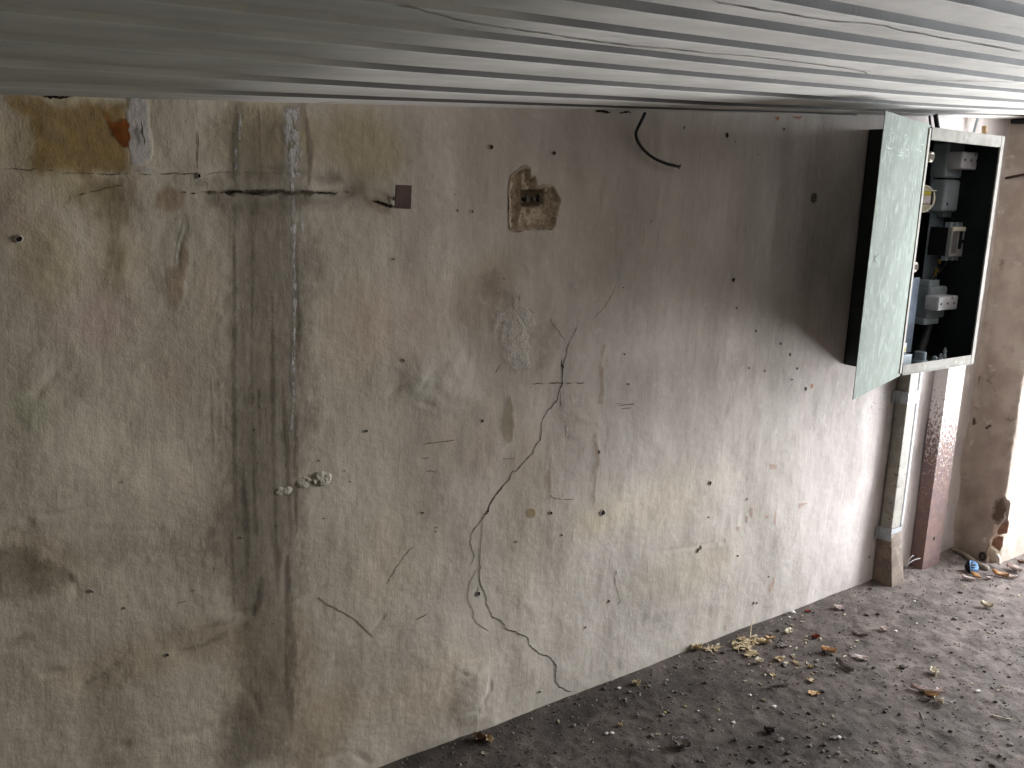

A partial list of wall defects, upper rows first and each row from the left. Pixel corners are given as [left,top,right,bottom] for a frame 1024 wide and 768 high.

leakage [0,95,139,190]
corrosion [108,119,130,147]
spalling [508,166,561,232]
leakage [149,100,345,768]
crack [468,321,586,692]
spalling [988,520,1009,565]